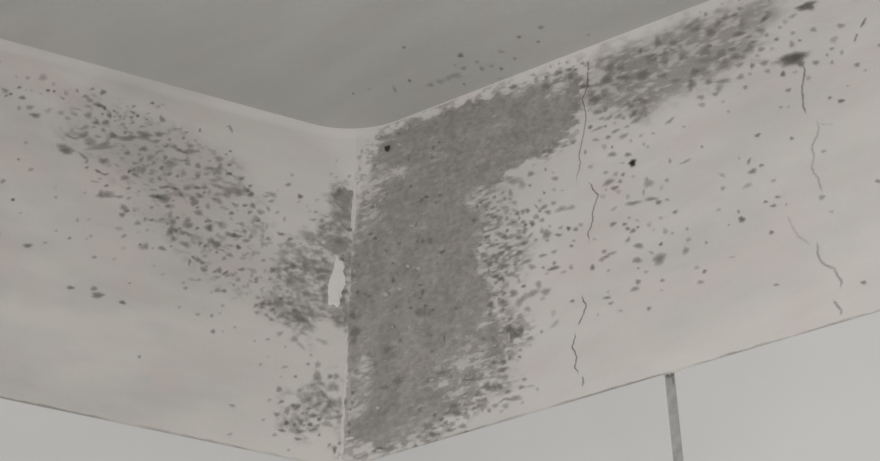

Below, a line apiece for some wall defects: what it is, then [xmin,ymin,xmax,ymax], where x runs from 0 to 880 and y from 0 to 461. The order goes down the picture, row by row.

peeling [328,256,355,307]
damp [287,54,675,452]